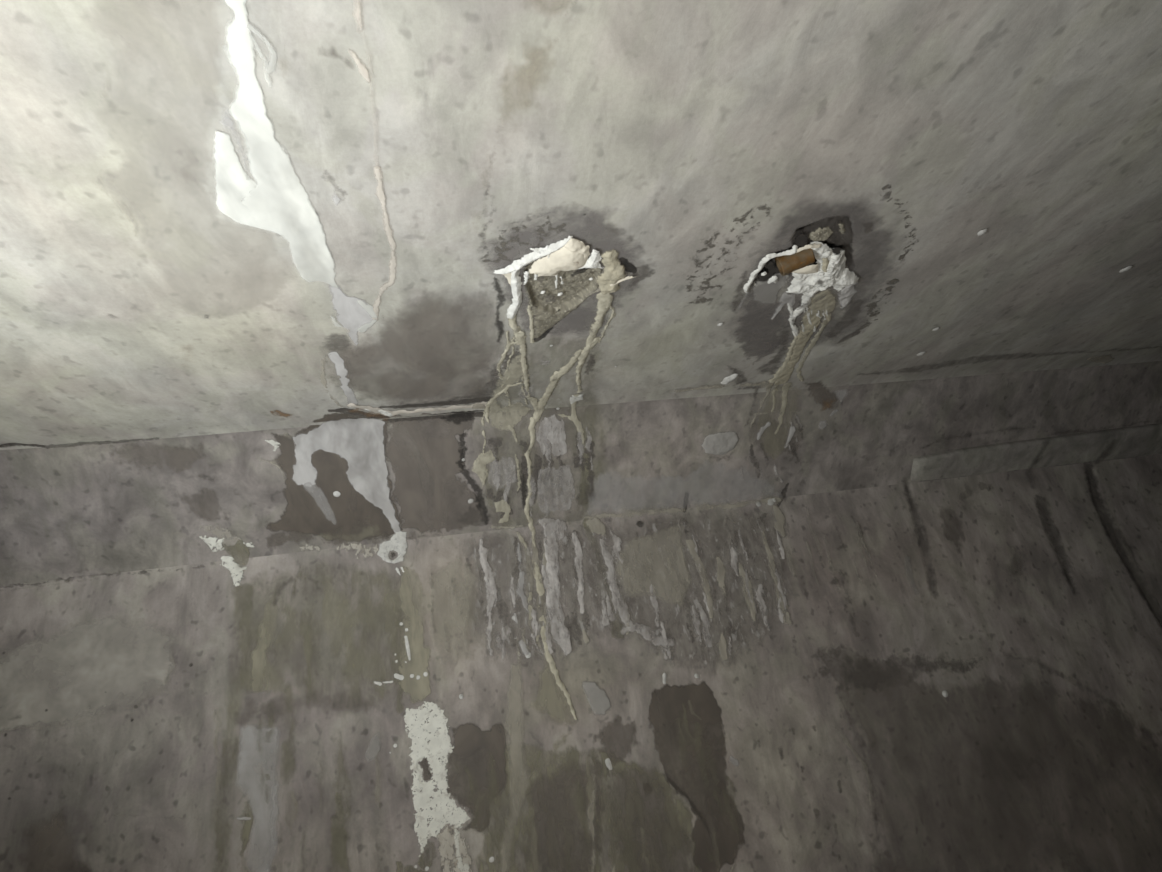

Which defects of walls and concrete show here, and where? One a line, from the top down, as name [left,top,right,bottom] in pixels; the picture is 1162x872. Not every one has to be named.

crack [0,441,45,449]
crack [328,397,491,422]
water stain [214,0,681,721]
water stain [676,185,915,448]
water stain [237,717,294,853]
peeling [396,701,472,872]
water stain [447,665,745,872]